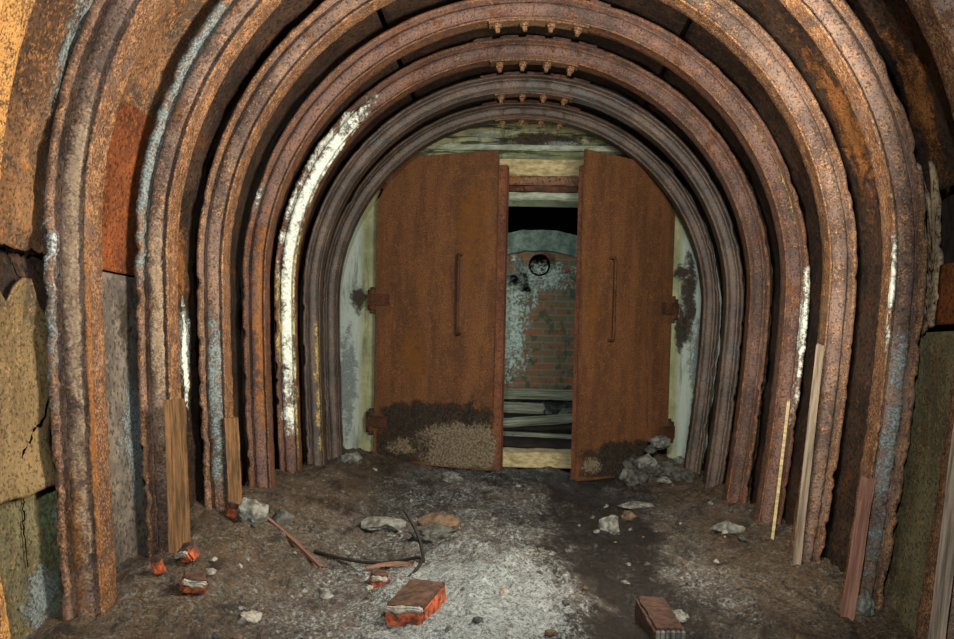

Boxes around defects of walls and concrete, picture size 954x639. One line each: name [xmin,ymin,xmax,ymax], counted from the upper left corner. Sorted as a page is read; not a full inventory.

crack [18,399,49,463]
rust [70,287,105,605]
water stain [275,106,368,460]
water stain [673,251,700,402]